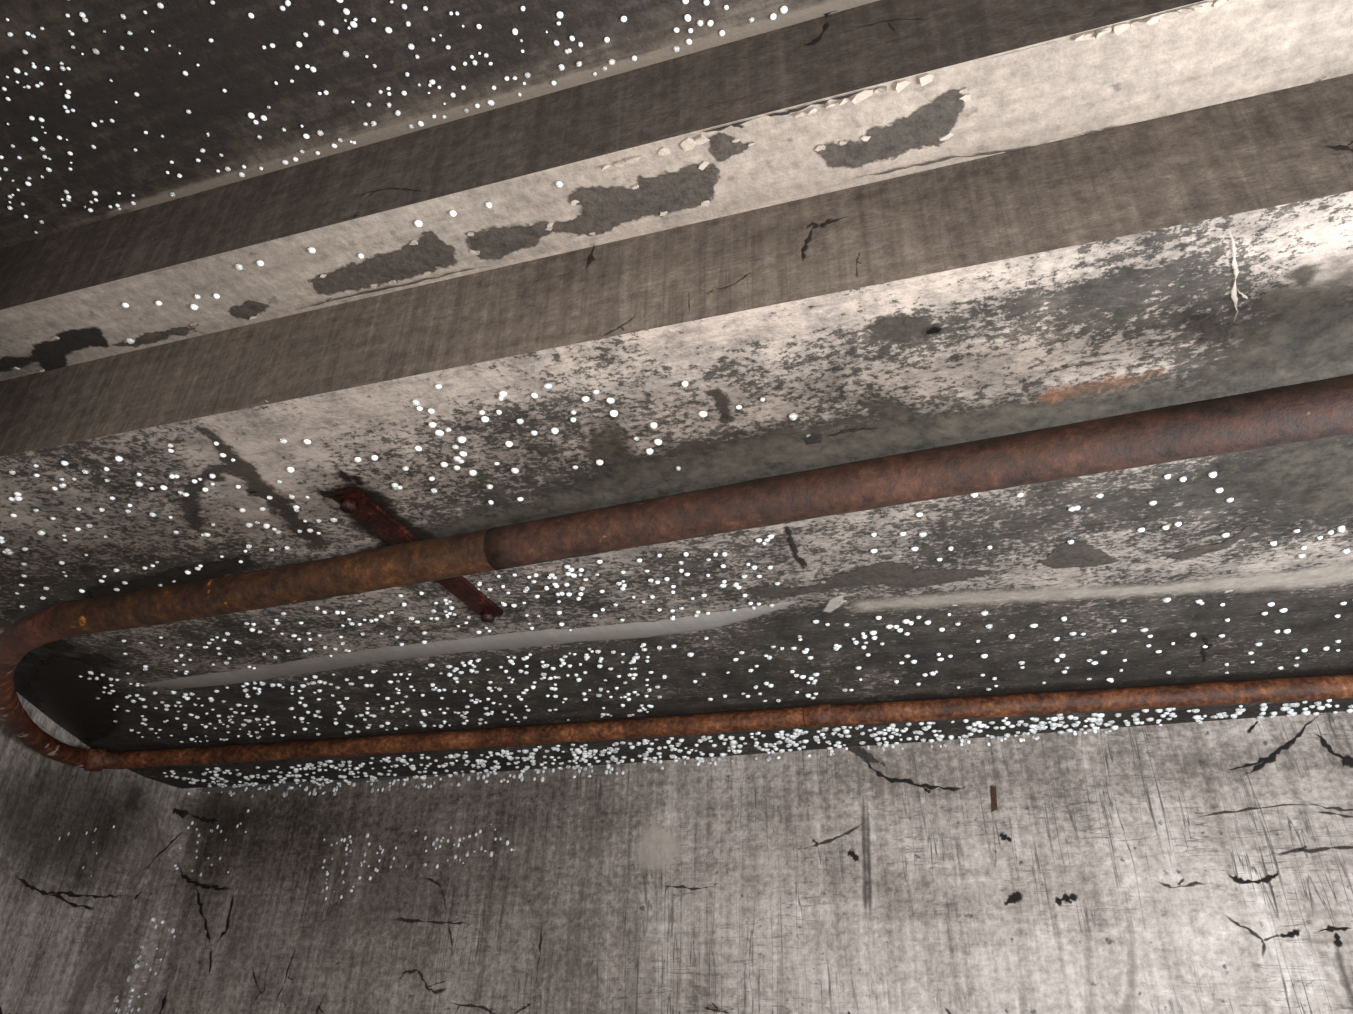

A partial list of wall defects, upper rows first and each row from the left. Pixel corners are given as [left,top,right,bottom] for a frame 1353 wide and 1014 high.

spalling [793,73,934,118]
spalling [814,87,971,168]
spalling [308,132,755,295]
spalling [0,322,198,372]
leakage [321,266,1353,544]
crack [1230,721,1353,774]
crack [864,760,961,793]
crack [1161,804,1353,888]
crack [1229,918,1350,954]